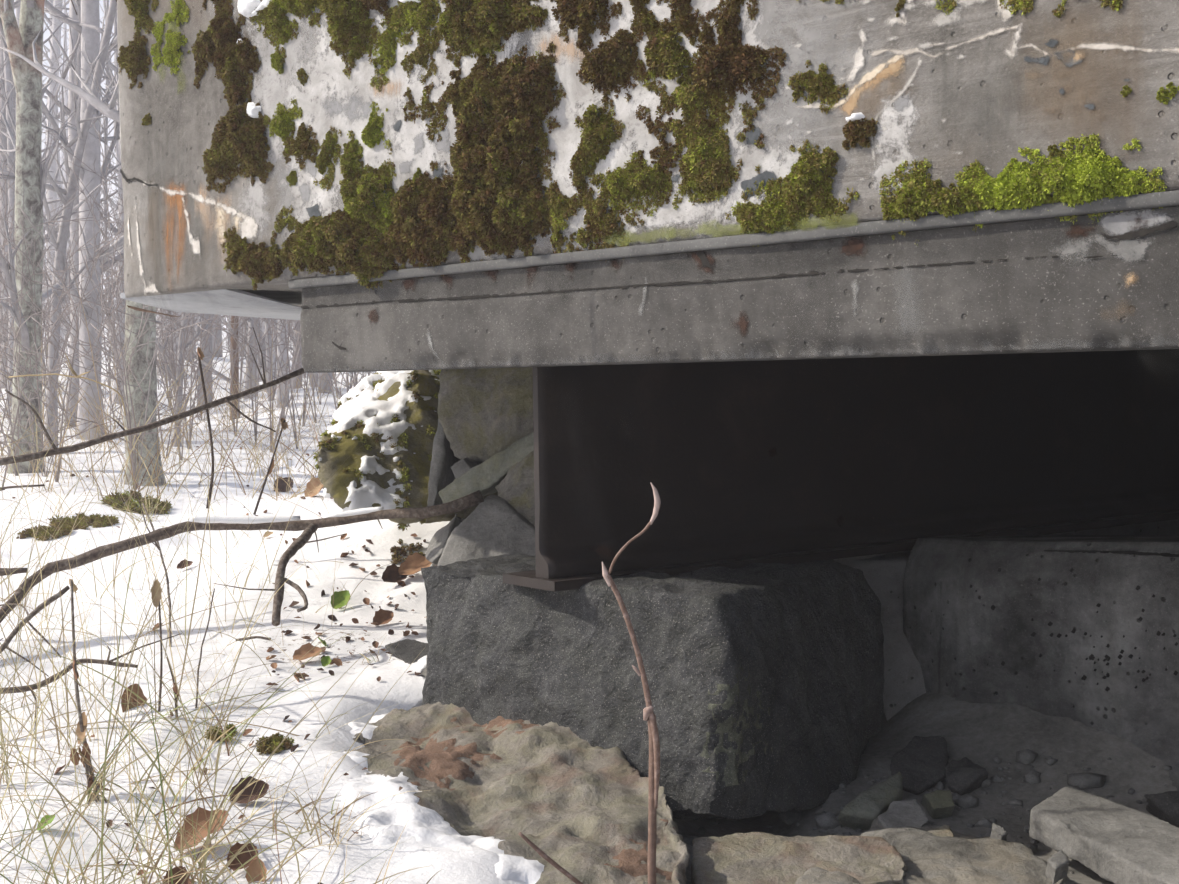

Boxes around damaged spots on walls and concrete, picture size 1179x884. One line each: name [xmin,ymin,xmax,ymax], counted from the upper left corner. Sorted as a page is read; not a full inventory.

rust [842,57,904,114]
crack [800,26,1179,158]
crack [120,169,158,186]
rust [166,185,185,270]